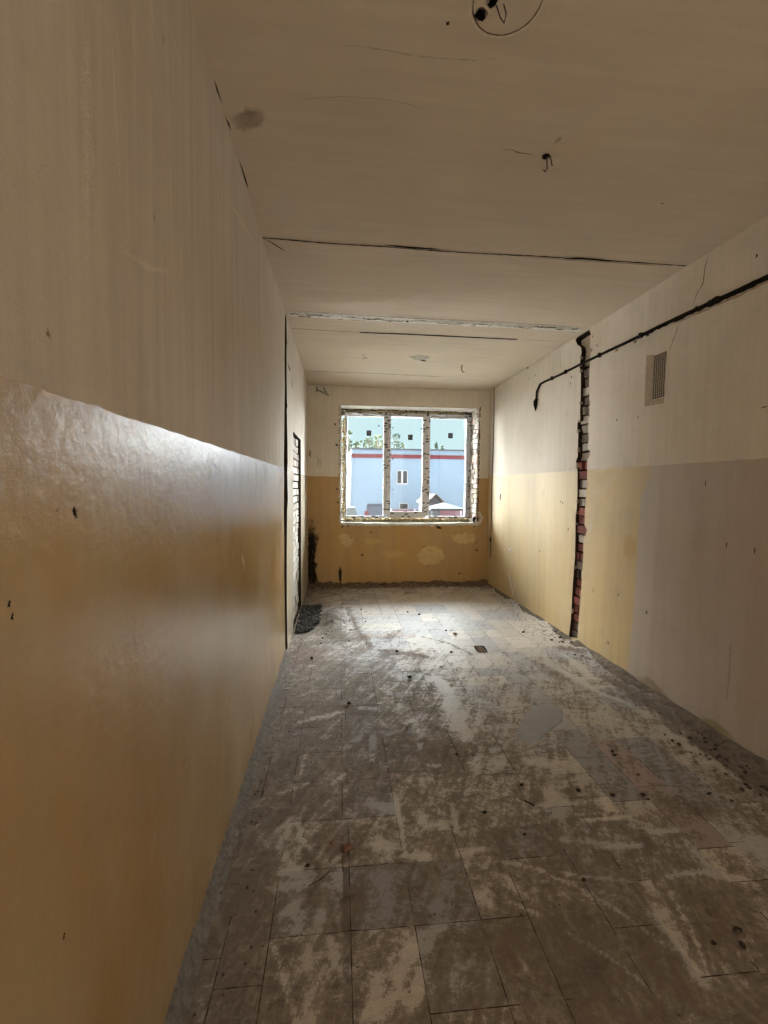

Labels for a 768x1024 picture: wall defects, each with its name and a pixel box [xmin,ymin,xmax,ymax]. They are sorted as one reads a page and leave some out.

crack [262,237,708,303]
spalling [337,404,483,566]
flaking render [570,355,590,638]